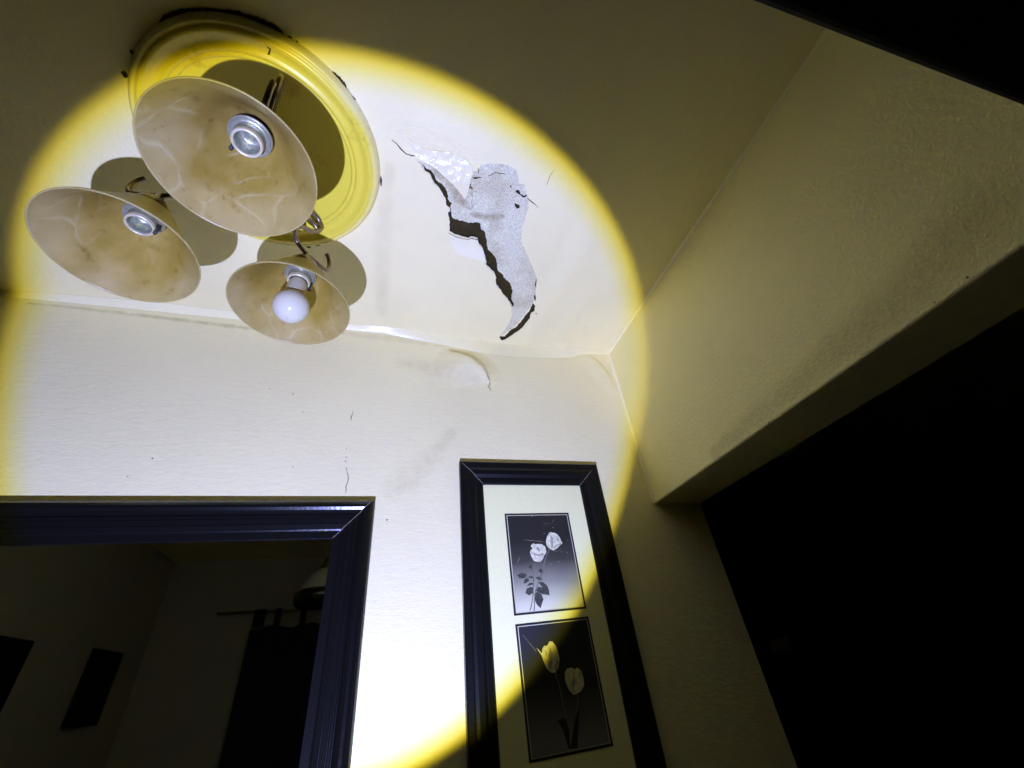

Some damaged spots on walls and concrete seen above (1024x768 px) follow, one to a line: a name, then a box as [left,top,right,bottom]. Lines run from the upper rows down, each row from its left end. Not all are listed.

peeling [395,123,537,336]